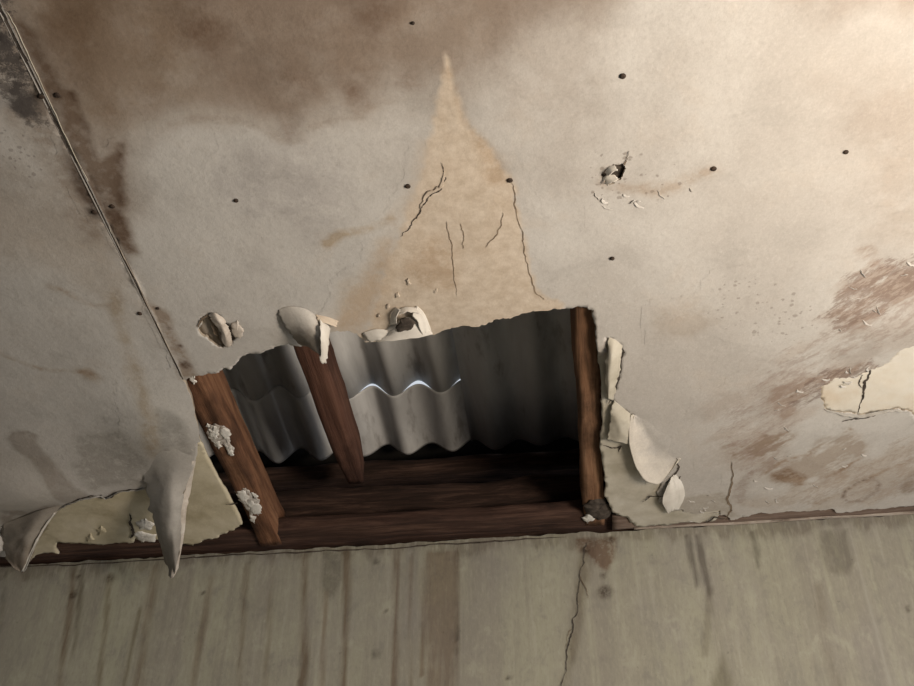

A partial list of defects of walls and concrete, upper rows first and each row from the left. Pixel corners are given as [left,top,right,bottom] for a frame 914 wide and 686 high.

peeling [0,439,243,578]
peeling [278,306,338,364]
damp [0,0,729,501]
peeling [362,48,567,344]
peeling [597,337,725,527]
damp [640,256,914,520]
damp [756,0,914,260]
peeling [821,346,914,422]
crack [561,543,589,685]